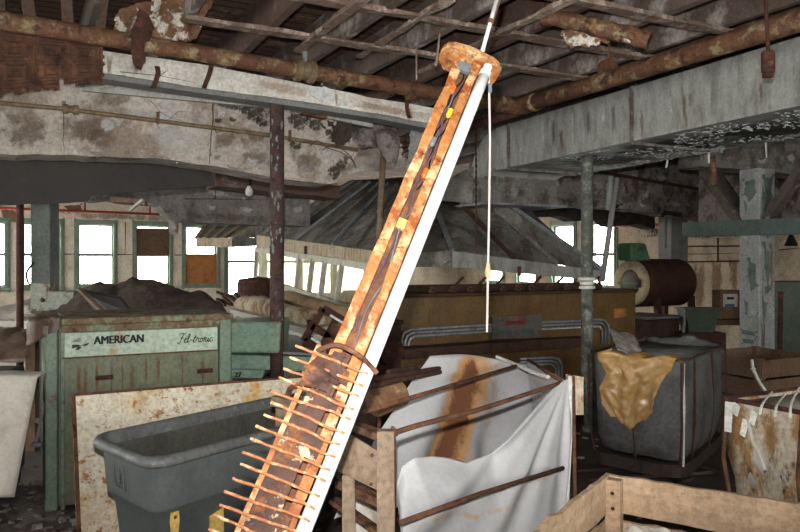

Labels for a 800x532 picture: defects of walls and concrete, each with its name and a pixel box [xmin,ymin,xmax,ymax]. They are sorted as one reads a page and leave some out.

damp [287,113,337,139]
damp [327,156,352,180]
peeling [560,110,800,182]
peeling [740,167,775,219]
peeling [746,235,772,318]